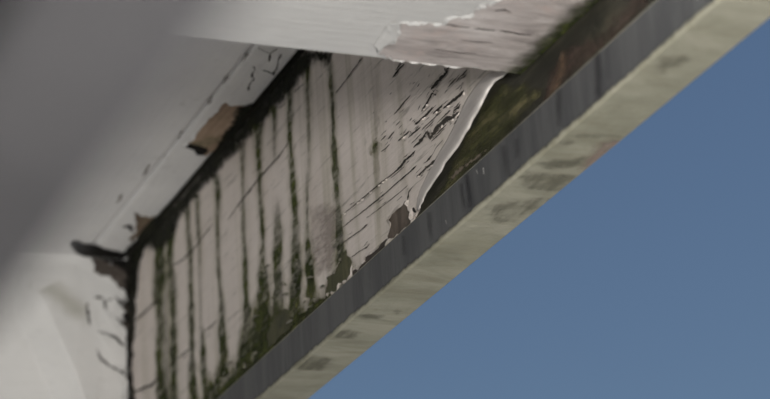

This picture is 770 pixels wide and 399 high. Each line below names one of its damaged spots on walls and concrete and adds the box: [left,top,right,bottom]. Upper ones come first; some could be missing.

crack [247,48,282,90]
peeling [374,0,587,73]
peeling [179,103,244,156]
leakage [129,49,344,399]
peeling [325,200,416,296]
peeling [70,212,155,399]
crack [86,280,190,399]